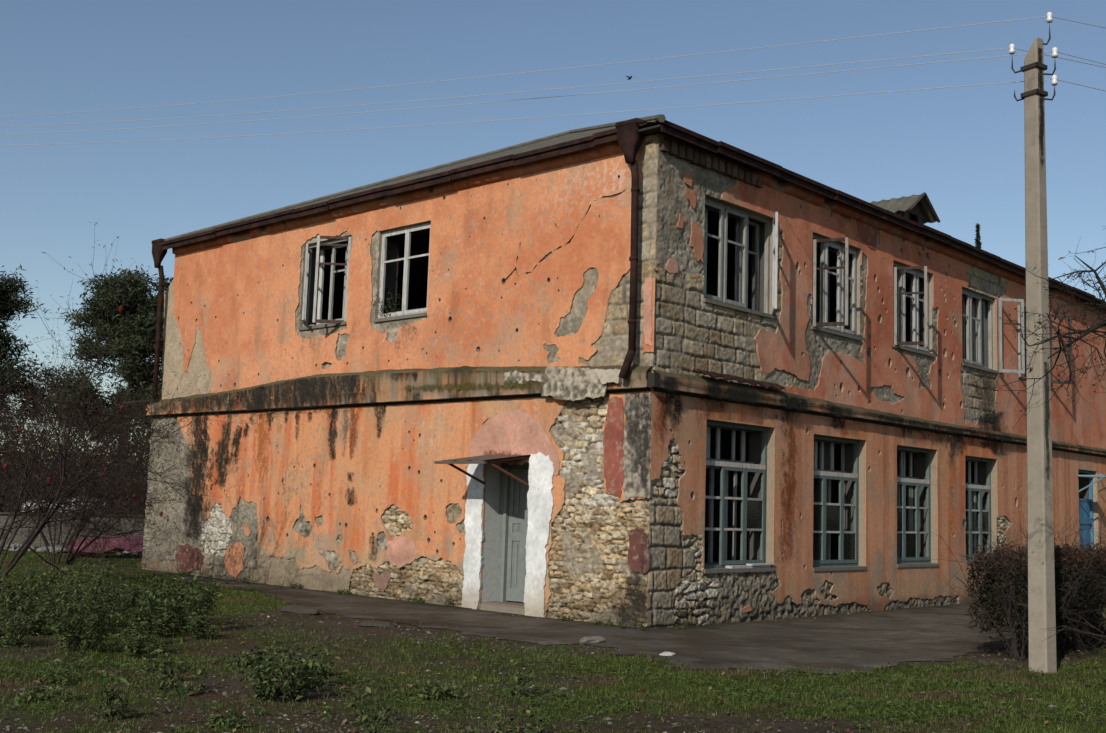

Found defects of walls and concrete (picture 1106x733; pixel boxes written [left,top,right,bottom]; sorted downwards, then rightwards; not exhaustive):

flaking render [967,265,1008,298]
peeling [161,280,213,400]
spalling [892,307,938,389]
water stain [374,403,386,436]
water stain [406,380,528,400]
flaking render [503,134,869,628]
spalling [868,385,904,404]
flaking render [960,365,997,426]
water stain [183,411,312,540]
flaking render [141,498,465,607]
spalling [877,581,958,610]